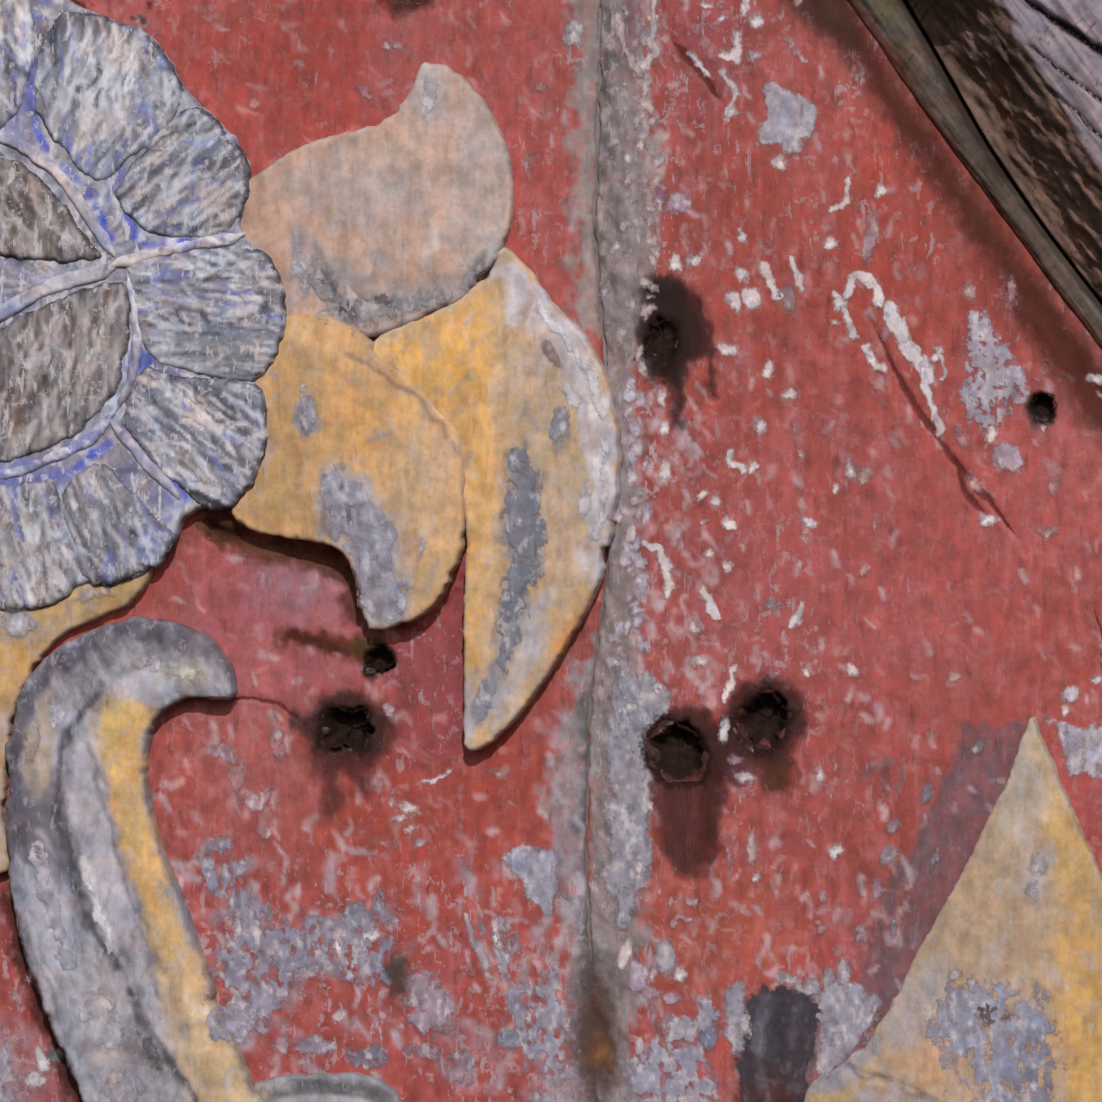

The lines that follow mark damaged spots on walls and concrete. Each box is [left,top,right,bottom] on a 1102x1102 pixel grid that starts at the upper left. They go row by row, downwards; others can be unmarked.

peeling [607,0,702,272]
peeling [757,81,817,170]
peeling [724,256,804,313]
peeling [831,213,1030,472]
crack [878,334,1012,529]
peeling [320,463,410,624]
peeling [578,345,880,1102]
peeling [1046,686,1102,778]
peeling [194,835,476,1085]
peeling [464,913,584,1102]
peeling [503,844,562,916]
peeling [926,969,1061,1102]